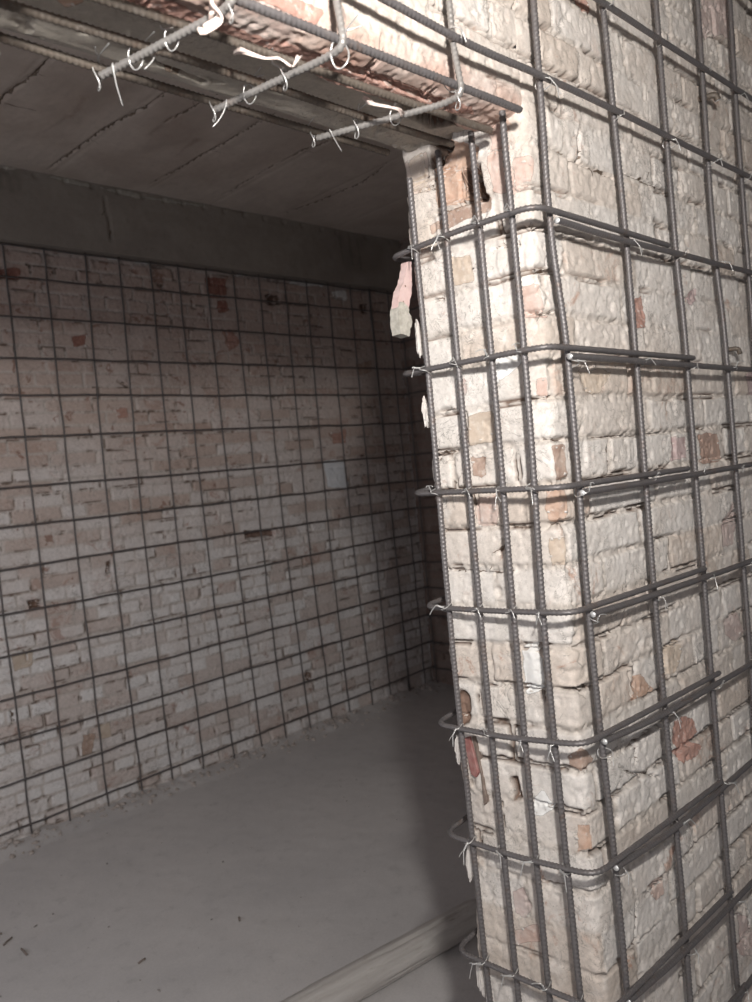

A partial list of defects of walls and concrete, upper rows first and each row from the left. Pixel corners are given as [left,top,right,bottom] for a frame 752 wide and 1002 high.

spalling [127,0,204,23]
spalling [262,0,323,25]
crack [0,58,49,111]
spalling [215,23,474,124]
crack [50,92,218,167]
spalling [377,0,752,1002]
spalling [0,242,452,837]